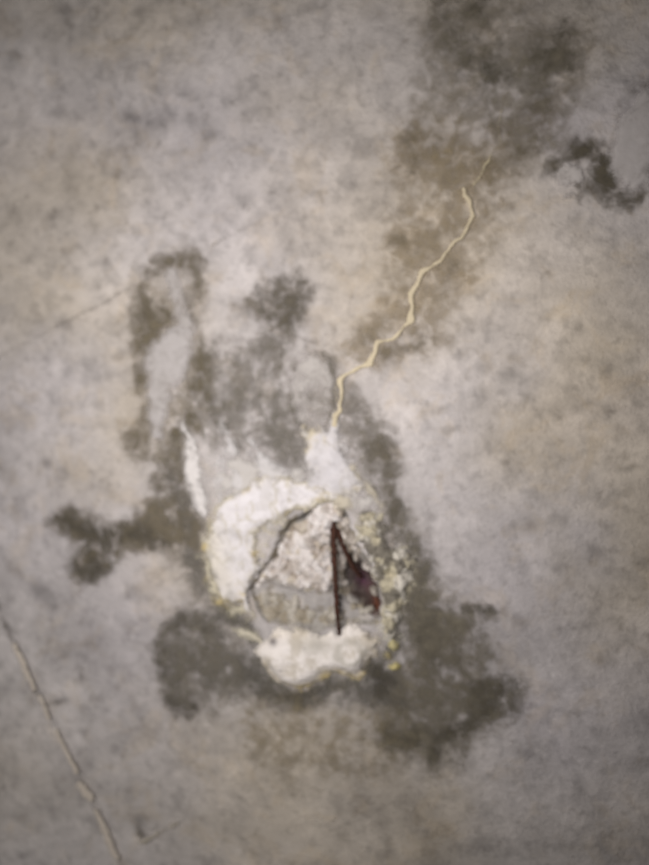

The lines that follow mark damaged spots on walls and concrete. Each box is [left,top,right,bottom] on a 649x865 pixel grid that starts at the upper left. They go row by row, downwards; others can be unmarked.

leakage [550,140,642,208]
leakage [134,285,170,356]
leakage [151,253,202,296]
leakage [246,277,311,337]
crack [332,158,490,427]
leakage [188,340,213,400]
leakage [55,394,516,761]
spalling [249,500,382,632]
rust [350,555,382,614]